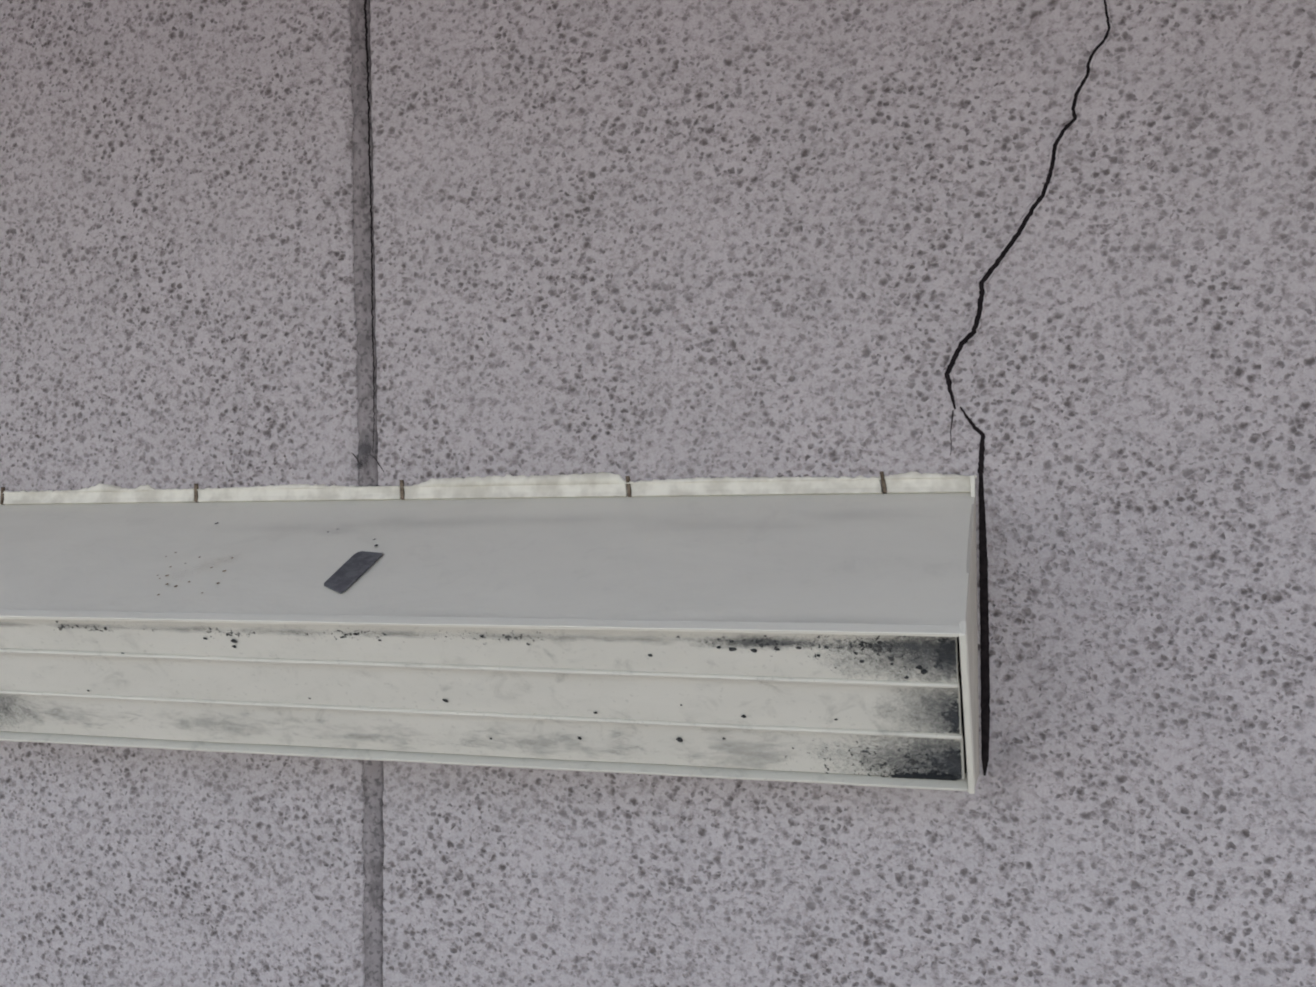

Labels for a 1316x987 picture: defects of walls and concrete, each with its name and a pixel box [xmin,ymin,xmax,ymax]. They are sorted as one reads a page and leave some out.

crack [941,0,1113,474]